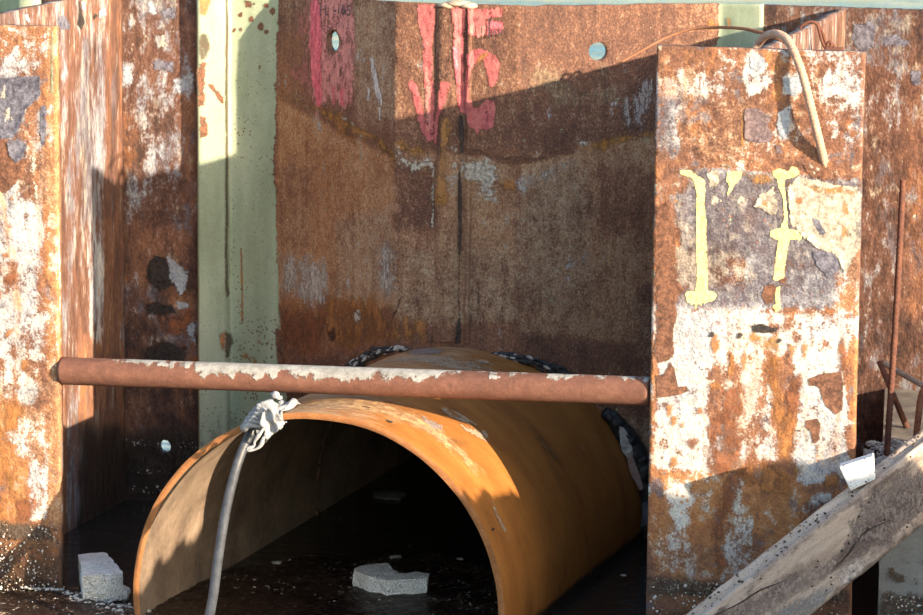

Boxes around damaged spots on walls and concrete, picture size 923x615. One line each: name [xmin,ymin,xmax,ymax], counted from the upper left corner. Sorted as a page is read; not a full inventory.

rust [0,148,23,201]
peeling [0,76,47,202]
rust [196,0,275,297]
rust [804,162,831,180]
rust [0,272,17,299]
rust [145,291,193,361]
rust [219,333,257,363]
rust [258,328,283,364]
rust [654,200,688,428]
rust [762,277,788,304]
rust [0,401,37,522]
rust [689,324,847,574]